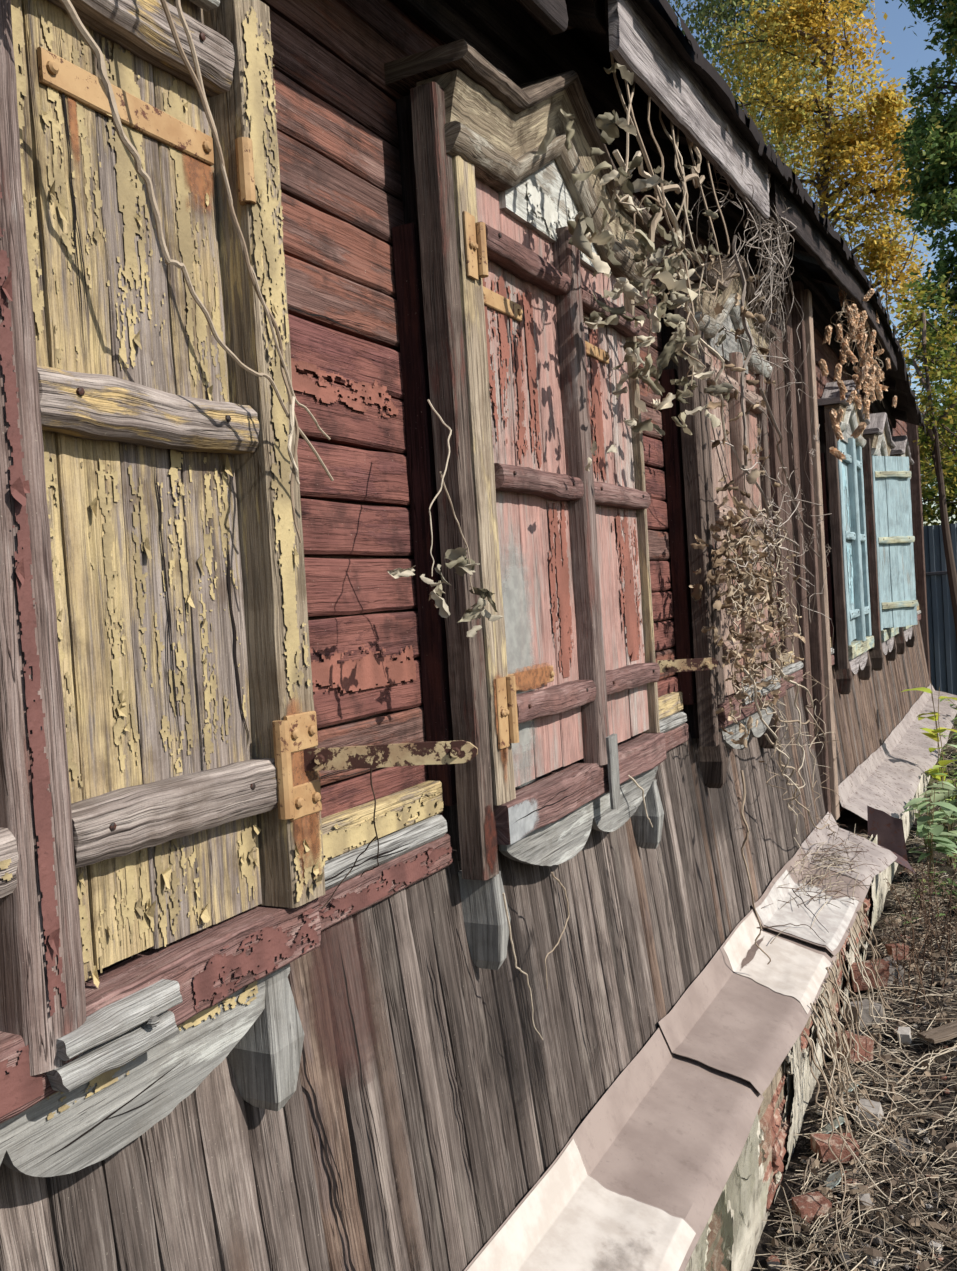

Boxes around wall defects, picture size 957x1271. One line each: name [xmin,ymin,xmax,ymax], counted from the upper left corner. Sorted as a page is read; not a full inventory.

rust [68,98,79,161]
peeling [11,5,165,379]
rust [184,153,212,210]
peeling [166,145,229,402]
peeling [243,6,416,699]
peeling [81,449,247,773]
peeling [77,838,210,989]
rust [292,751,320,787]
rust [294,812,321,865]
peeling [177,791,453,1031]
rust [494,663,551,732]
water stain [467,1138,696,1271]